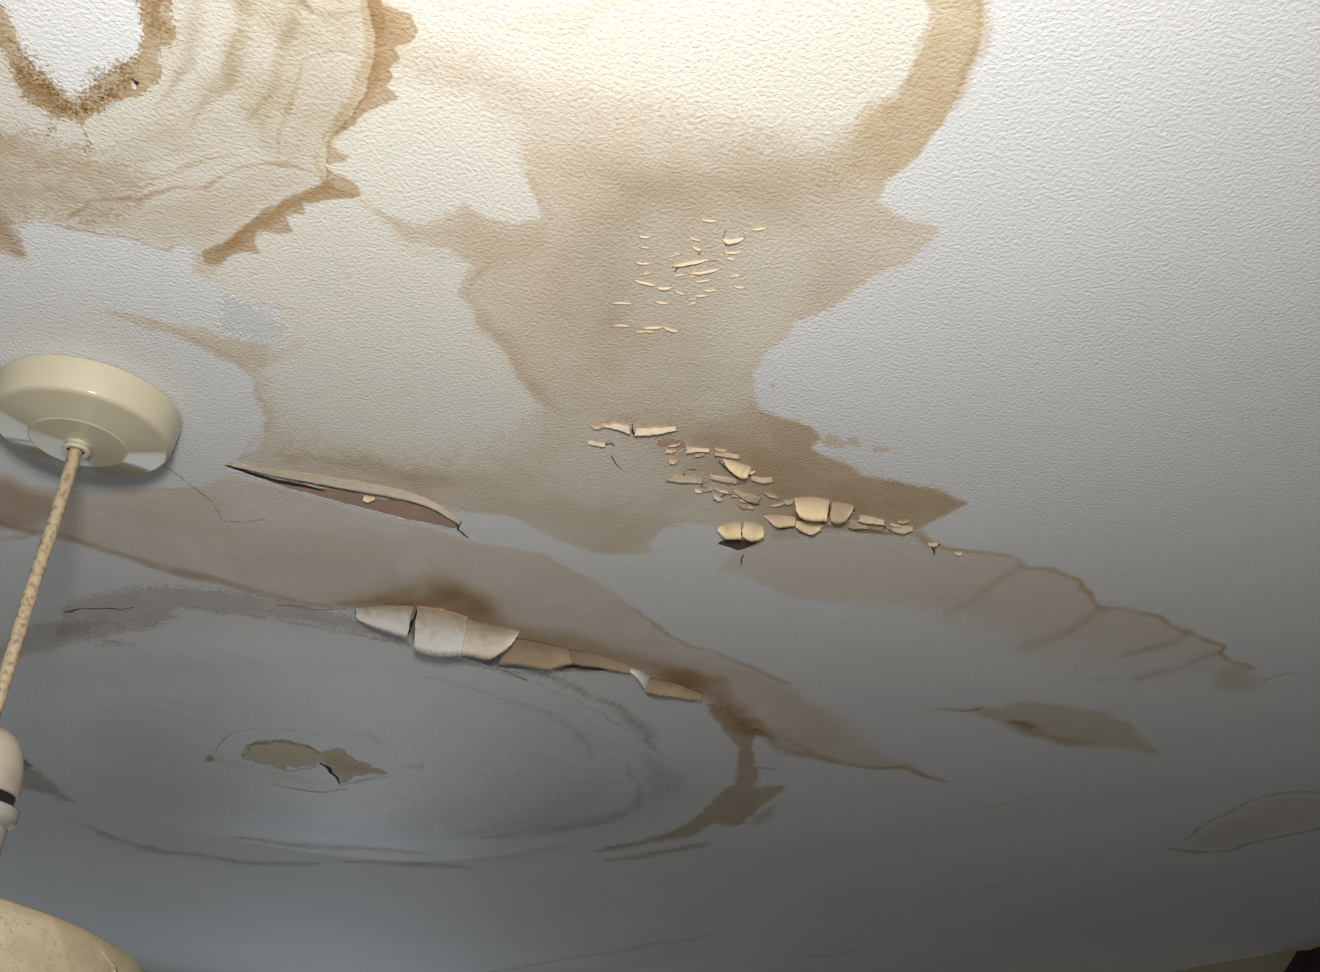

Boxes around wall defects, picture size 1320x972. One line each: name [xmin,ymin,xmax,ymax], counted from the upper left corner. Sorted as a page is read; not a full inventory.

crack [164,465,265,522]
crack [226,463,477,543]
peeling [588,421,914,567]
peeling [242,731,391,793]